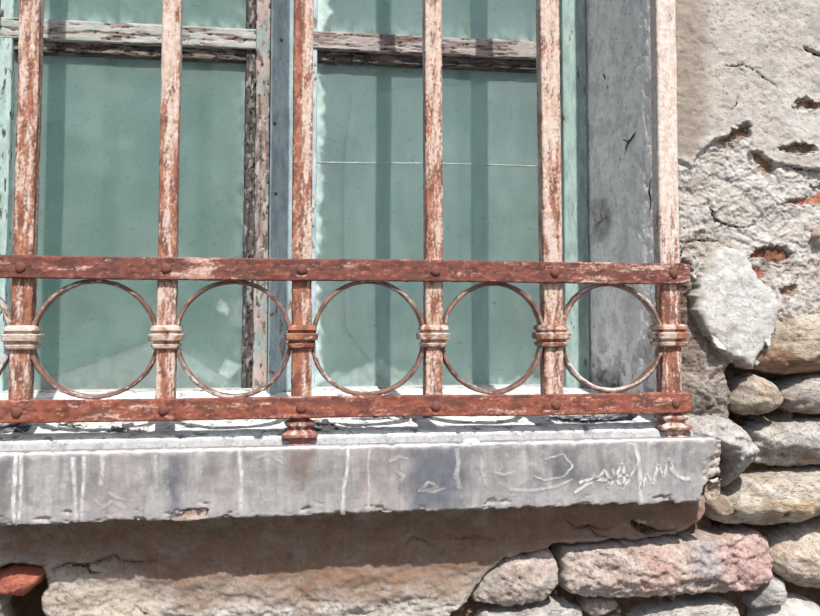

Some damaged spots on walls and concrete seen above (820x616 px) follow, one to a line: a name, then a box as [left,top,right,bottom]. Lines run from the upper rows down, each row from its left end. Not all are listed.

spalling [791,97,820,112]
spalling [716,124,778,176]
spalling [778,139,816,155]
flaking render [781,182,820,207]
spalling [748,245,794,282]
spalling [779,282,799,299]